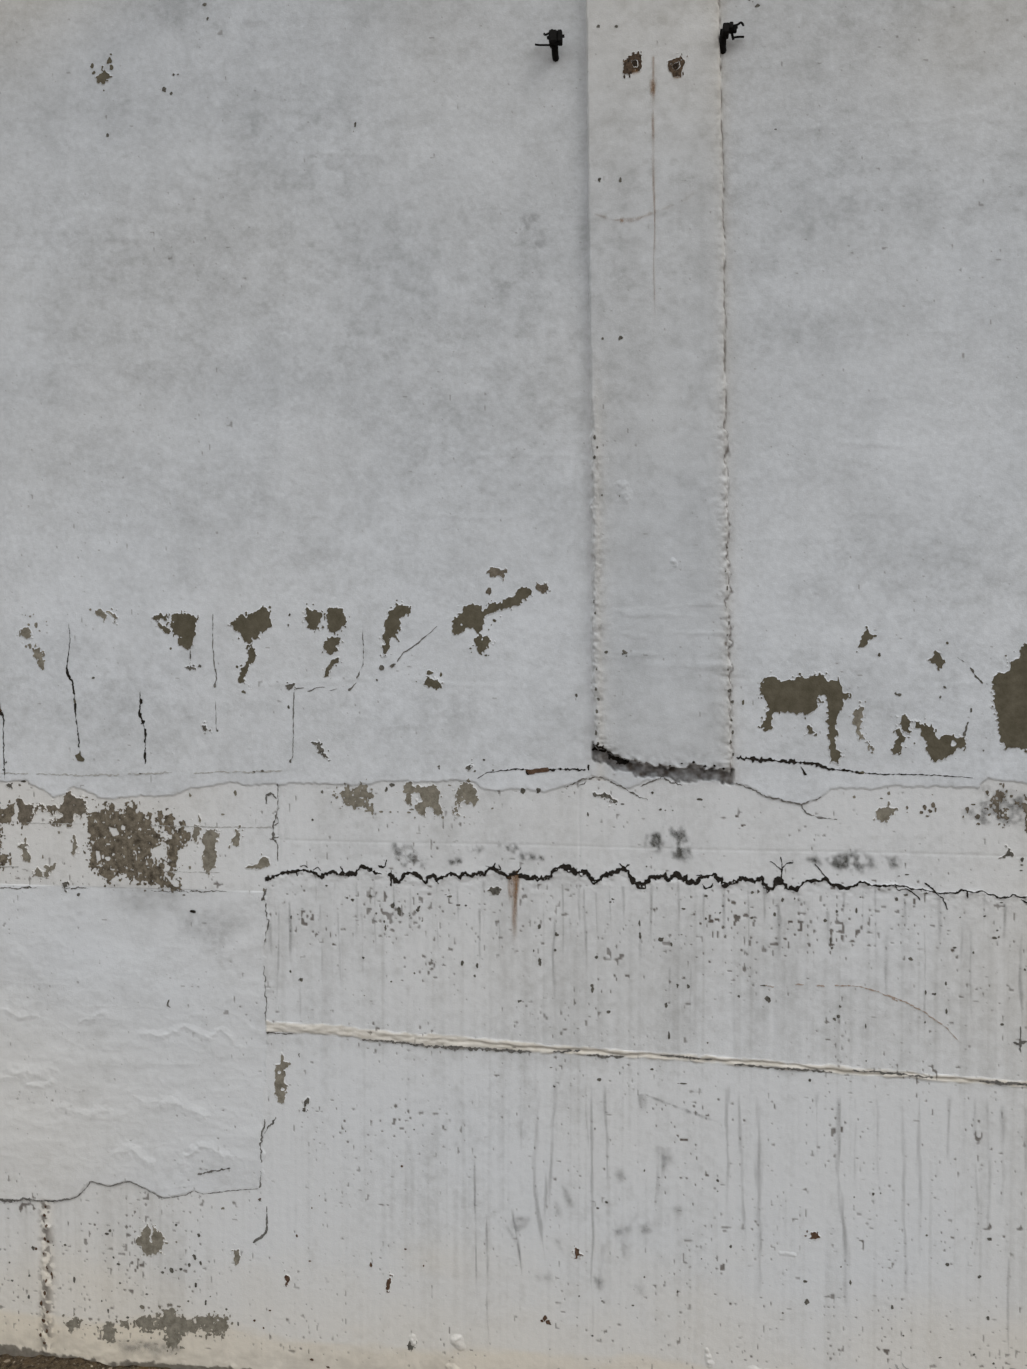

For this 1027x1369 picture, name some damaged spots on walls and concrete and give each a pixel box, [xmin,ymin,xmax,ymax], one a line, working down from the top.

peeling [151,608,201,671]
peeling [227,603,351,694]
peeling [451,566,550,656]
peeling [669,670,984,770]
peeling [990,643,1027,754]
peeling [0,769,244,913]
crack [0,617,1027,1035]
crack [362,1039,624,1059]
crack [661,1055,933,1078]
crack [980,1079,1027,1087]
crack [0,1117,276,1243]
peeling [9,1205,271,1355]